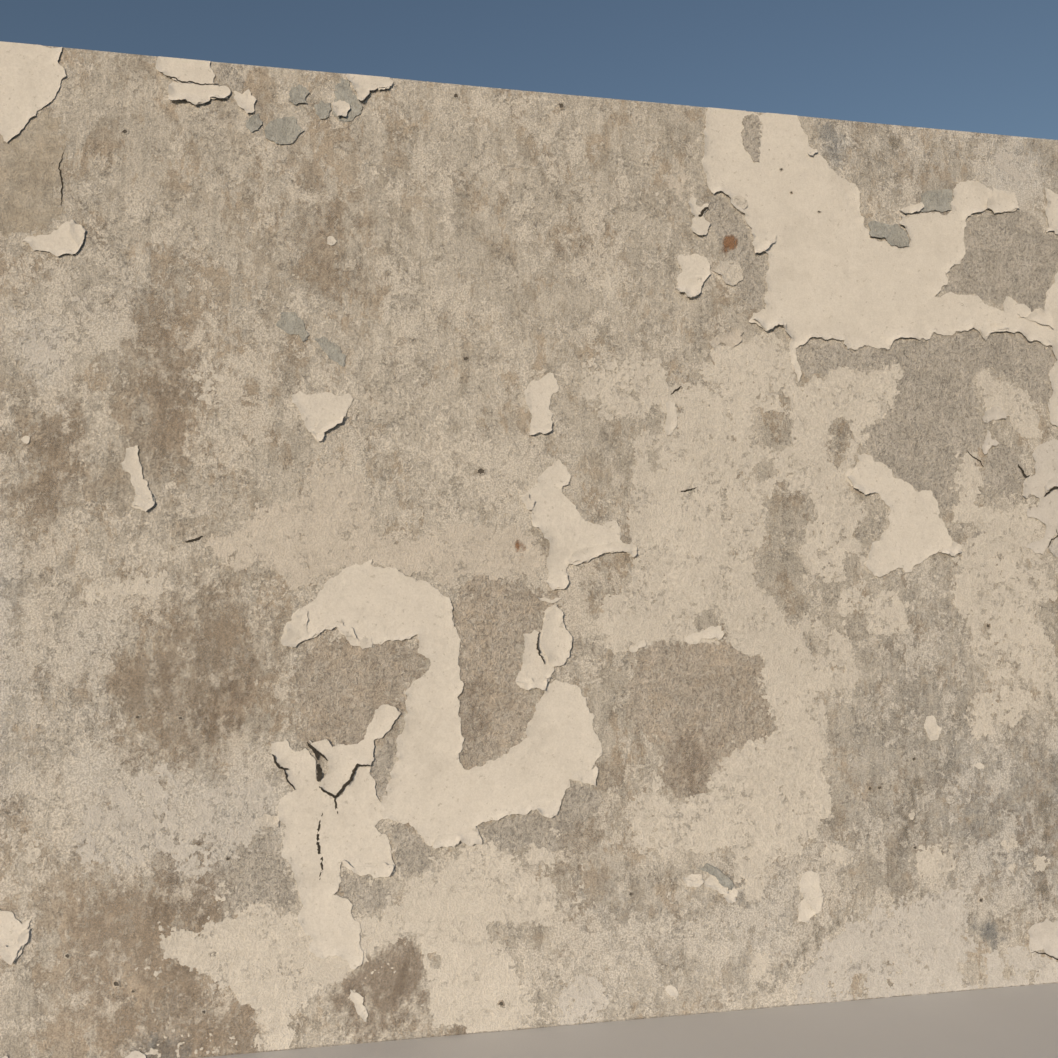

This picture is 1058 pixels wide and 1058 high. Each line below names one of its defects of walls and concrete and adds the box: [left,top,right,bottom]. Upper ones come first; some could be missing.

spalling [0,41,86,257]
peeling [155,56,393,144]
peeling [71,107,1058,969]
crack [272,742,371,880]
peeling [0,910,30,965]
peeling [125,1027,190,1058]
peeling [157,903,355,1052]
peeling [340,779,603,1034]
peeling [557,957,613,1025]
peeling [665,985,679,999]
peeling [749,945,786,983]
peeling [781,841,1058,1005]